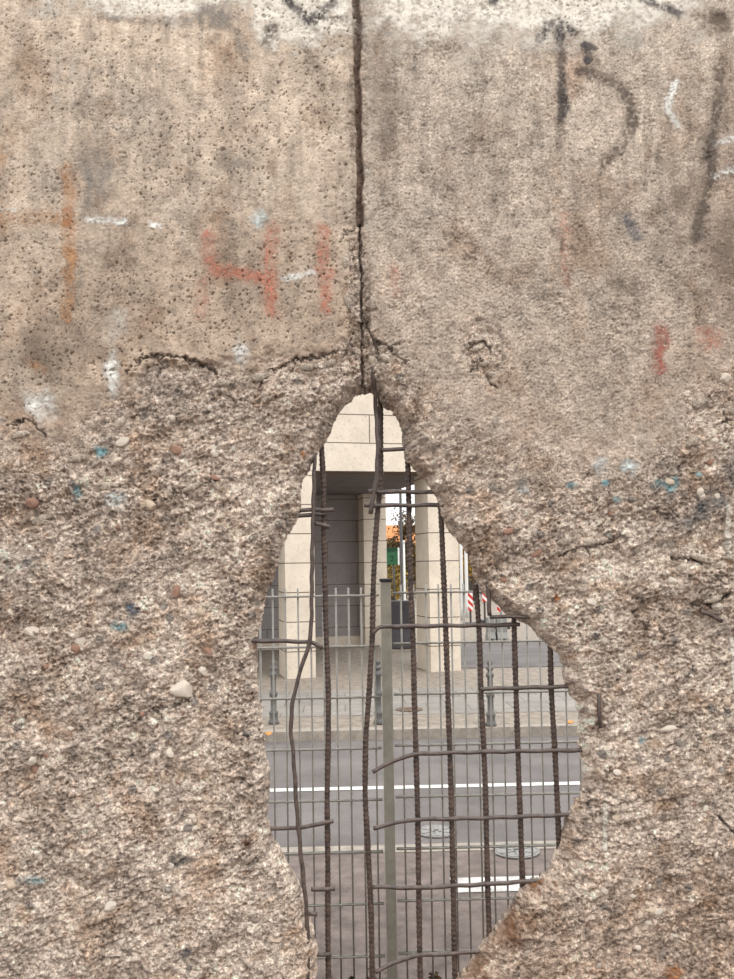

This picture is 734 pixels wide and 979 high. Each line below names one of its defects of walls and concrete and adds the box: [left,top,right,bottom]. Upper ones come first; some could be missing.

spalling [0,232,734,979]